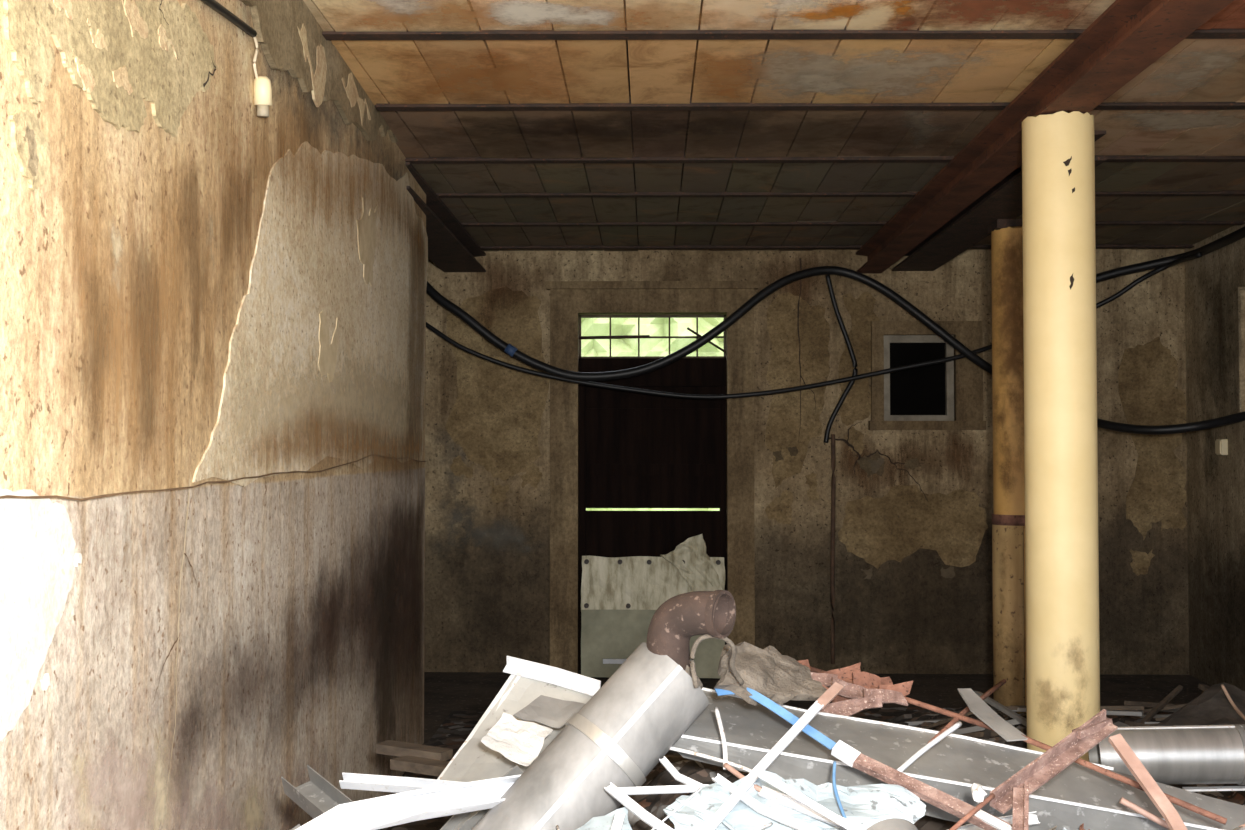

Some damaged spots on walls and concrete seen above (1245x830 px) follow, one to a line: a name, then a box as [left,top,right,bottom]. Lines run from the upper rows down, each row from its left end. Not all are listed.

spalling [2,0,218,191]
damp [354,0,679,29]
damp [701,50,980,99]
corrosion [888,0,1093,31]
damp [75,193,184,450]
peeling [192,130,428,487]
corrosion [998,237,1024,400]
peeling [838,485,988,579]
corrosion [992,513,1025,526]
peeling [0,489,82,741]
crack [0,454,426,783]
damp [83,751,263,830]